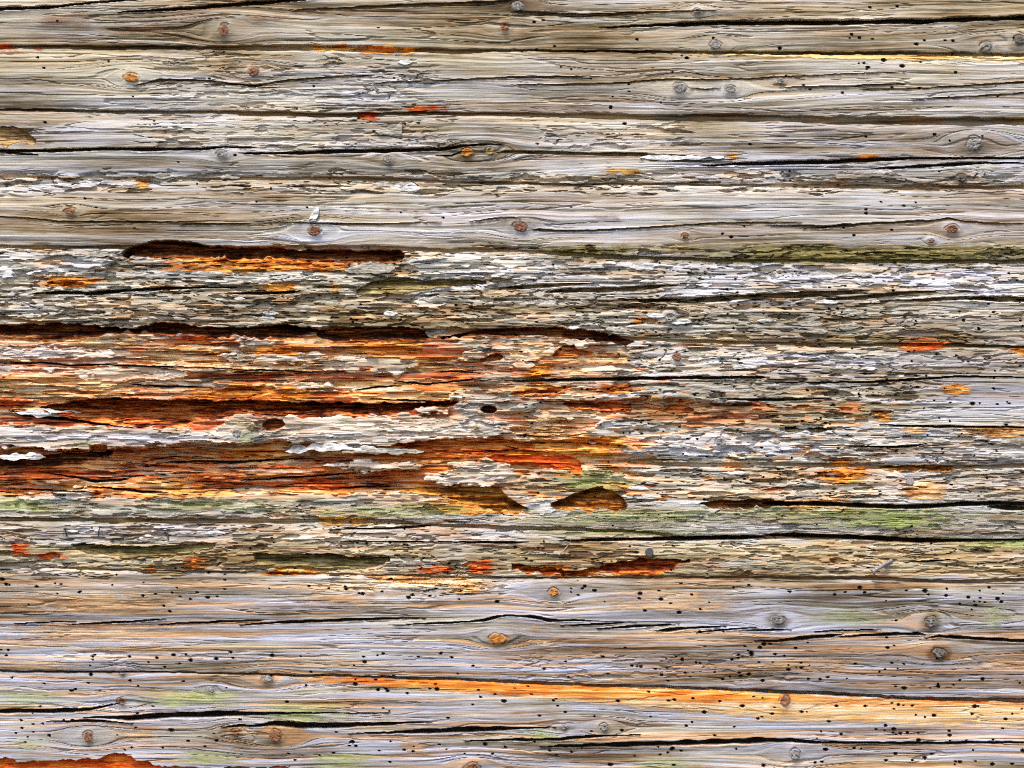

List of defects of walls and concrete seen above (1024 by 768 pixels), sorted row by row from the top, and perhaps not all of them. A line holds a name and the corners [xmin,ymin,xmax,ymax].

crack [0,144,1024,169]
spalling [0,241,562,311]
spalling [0,300,633,382]
spalling [0,386,657,515]
spalling [880,458,974,473]
spalling [701,471,847,510]
crack [763,501,1024,510]
spalling [59,530,256,558]
spalling [256,553,390,570]
spalling [512,558,689,576]
crack [14,615,1024,642]
crack [0,703,1024,747]